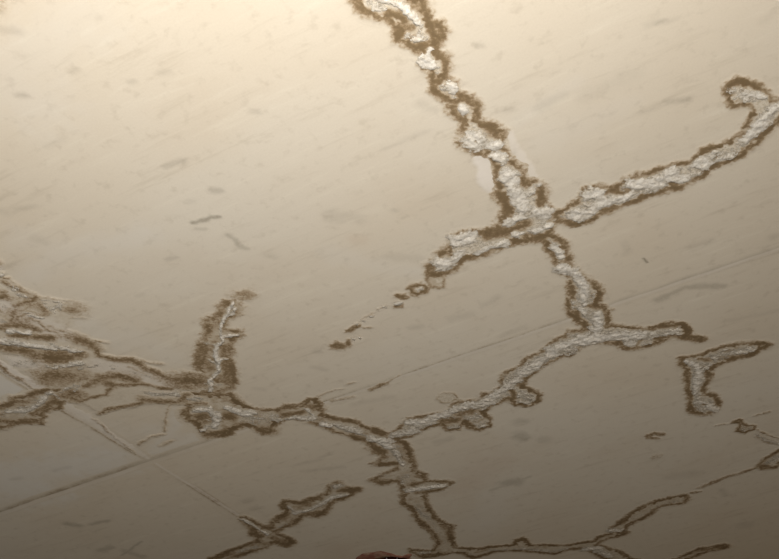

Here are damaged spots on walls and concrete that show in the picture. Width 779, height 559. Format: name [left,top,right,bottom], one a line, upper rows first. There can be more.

crack [0,387,67,432]
crack [173,0,779,559]